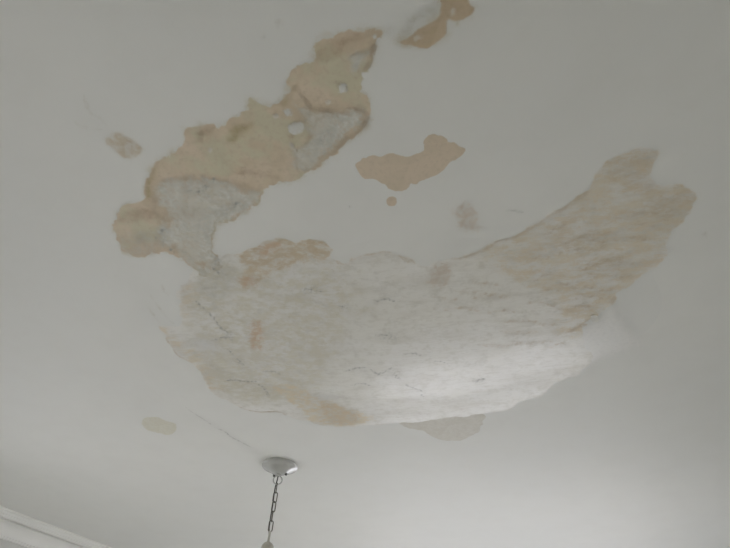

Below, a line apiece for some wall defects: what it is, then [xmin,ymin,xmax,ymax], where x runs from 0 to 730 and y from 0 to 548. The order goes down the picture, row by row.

peeling [105,0,698,427]